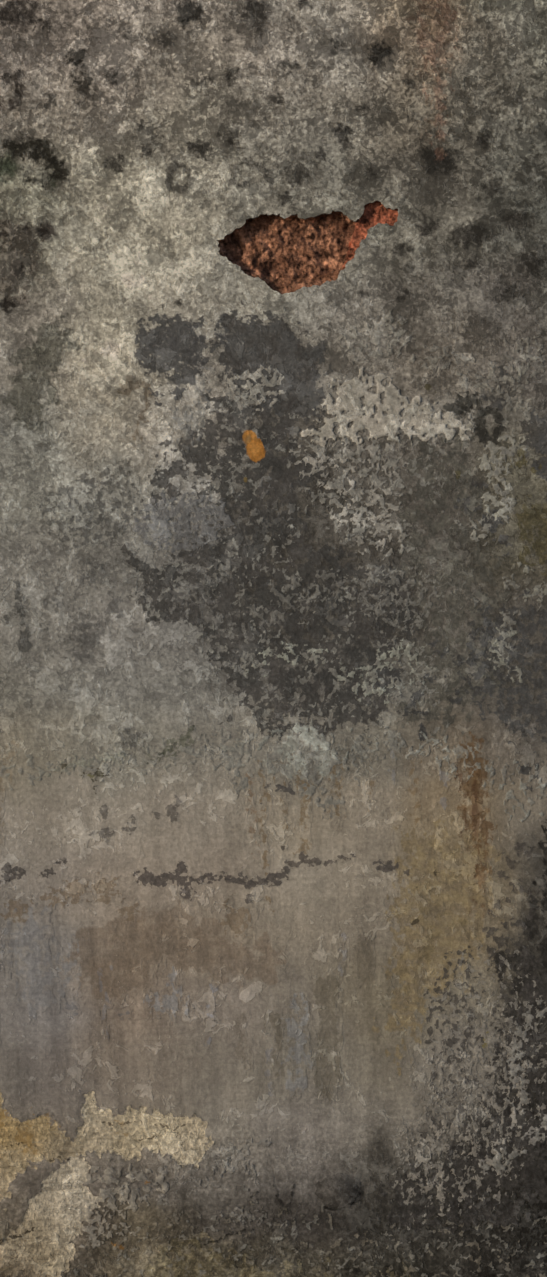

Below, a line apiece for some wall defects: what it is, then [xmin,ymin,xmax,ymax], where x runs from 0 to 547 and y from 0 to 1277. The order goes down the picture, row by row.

spalling [218,201,398,294]
leakage [116,373,155,443]
corrosion [241,429,267,464]
leakage [489,818,547,1027]
peeling [0,841,547,1277]